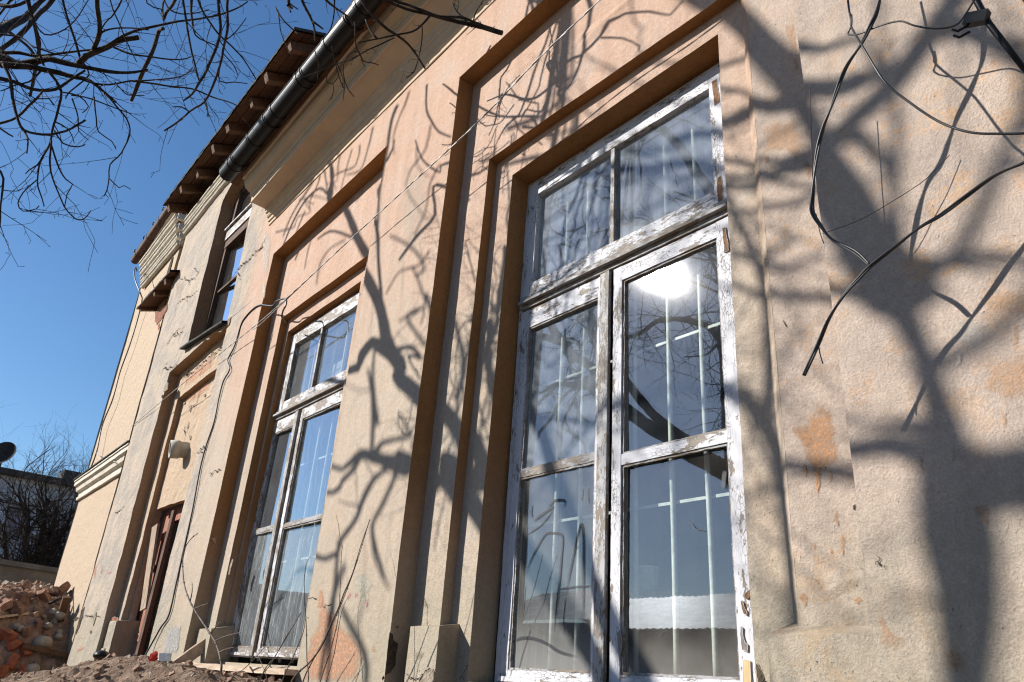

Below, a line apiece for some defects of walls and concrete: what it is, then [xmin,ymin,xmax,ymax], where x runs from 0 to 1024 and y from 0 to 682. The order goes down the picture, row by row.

peeling [306,591,359,680]
peeling [740,590,766,682]